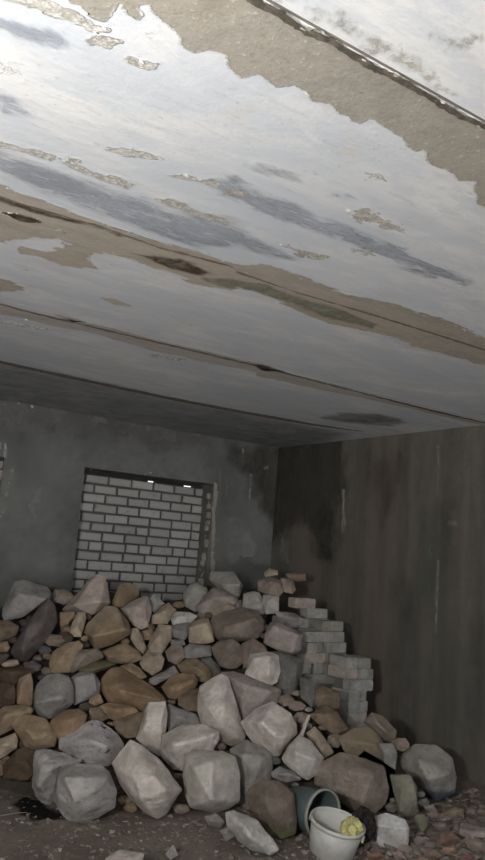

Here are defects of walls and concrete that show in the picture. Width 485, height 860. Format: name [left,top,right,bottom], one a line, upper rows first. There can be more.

peeling [0,0,485,208]
leakage [0,159,262,250]
peeling [0,184,485,365]
leakage [218,178,467,283]
peeling [0,278,485,425]
leakage [232,441,346,559]